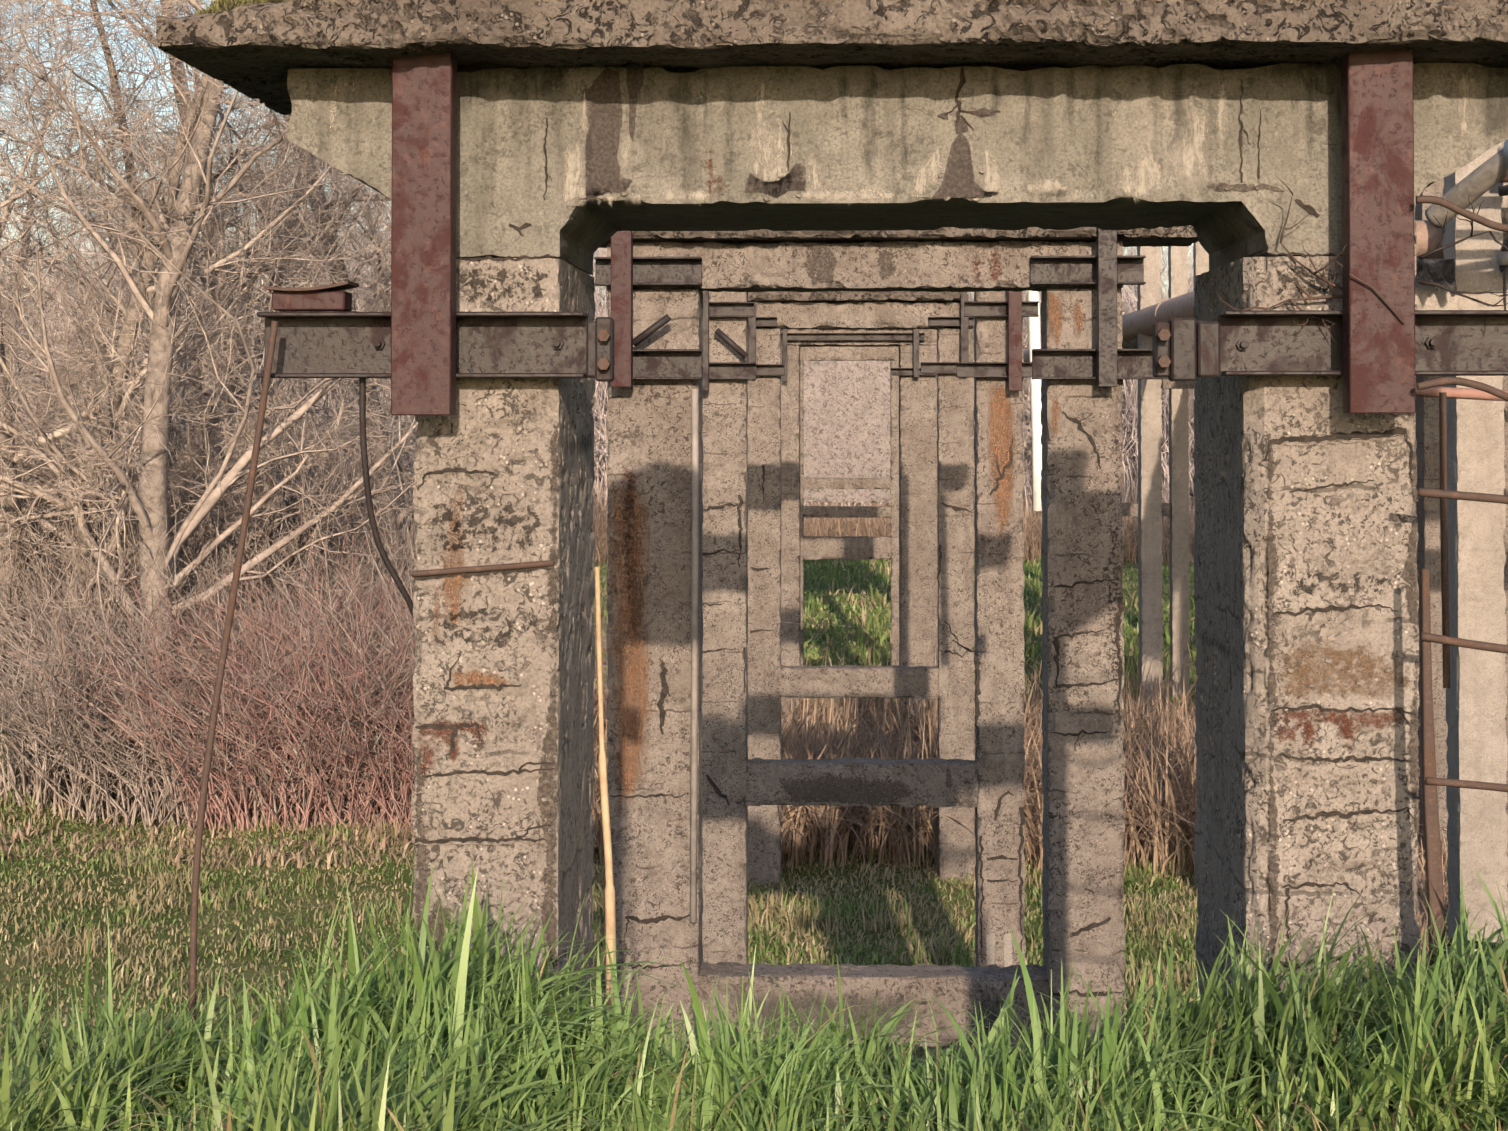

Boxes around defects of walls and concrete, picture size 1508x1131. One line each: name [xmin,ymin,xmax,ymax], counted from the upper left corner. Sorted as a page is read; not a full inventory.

crack [945,66,1001,131]
crack [1238,80,1261,183]
damp [564,146,612,203]
damp [631,189,708,202]
crack [1269,199,1336,278]
corrosion [987,388,1013,531]
crack [1062,411,1101,469]
corrosion [610,469,650,800]
corrosion [455,671,504,685]
corrosion [1276,709,1403,745]